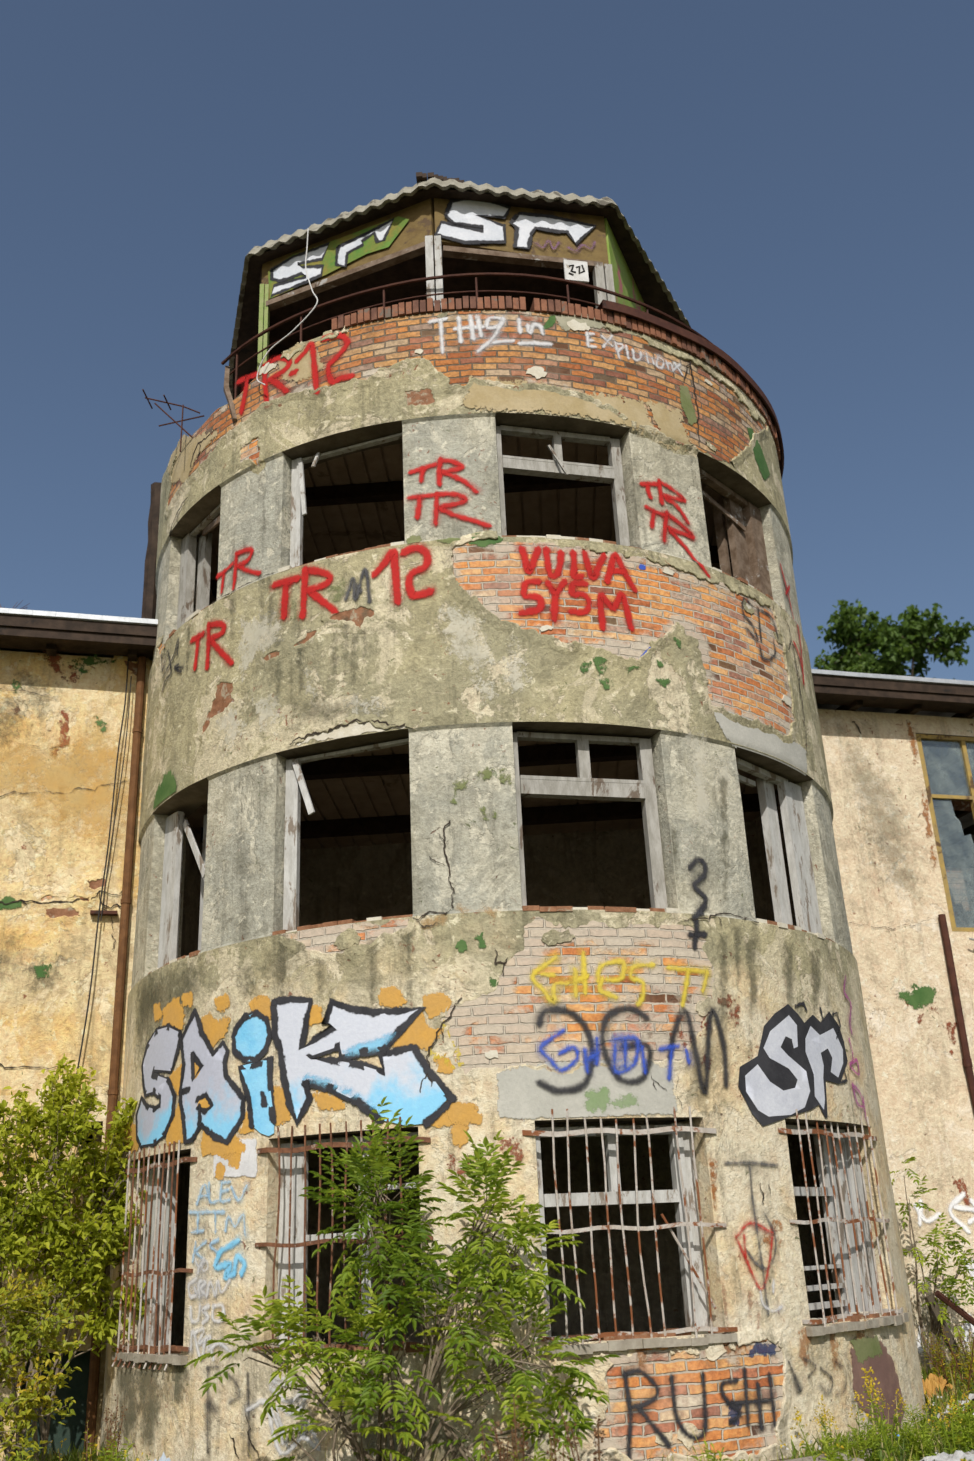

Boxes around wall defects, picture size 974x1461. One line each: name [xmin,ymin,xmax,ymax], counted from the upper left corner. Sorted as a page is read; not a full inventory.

spalling [165,311,770,521]
spalling [406,530,807,776]
crack [0,781,124,797]
crack [409,820,455,928]
spalling [429,914,723,1121]
spalling [575,1323,793,1461]